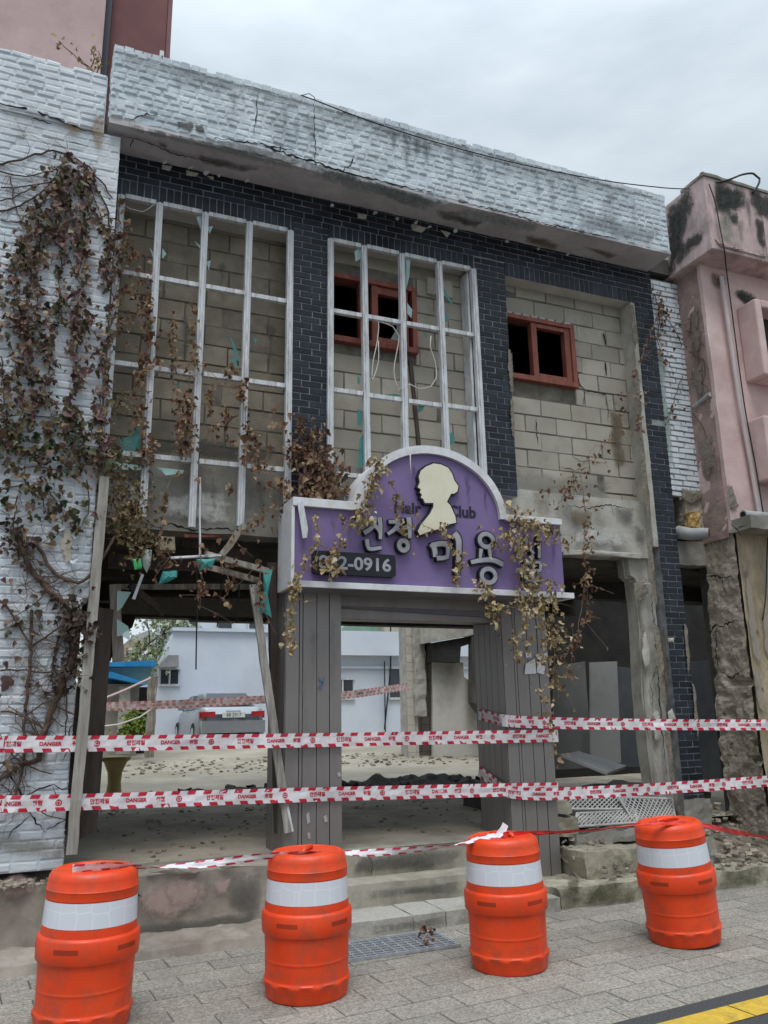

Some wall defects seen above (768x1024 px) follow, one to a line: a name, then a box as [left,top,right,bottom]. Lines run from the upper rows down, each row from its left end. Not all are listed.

crack [0,90,617,239]
water stain [315,171,557,248]
mould [667,191,702,273]
water stain [715,182,768,246]
crack [569,504,633,515]
crack [709,620,740,679]